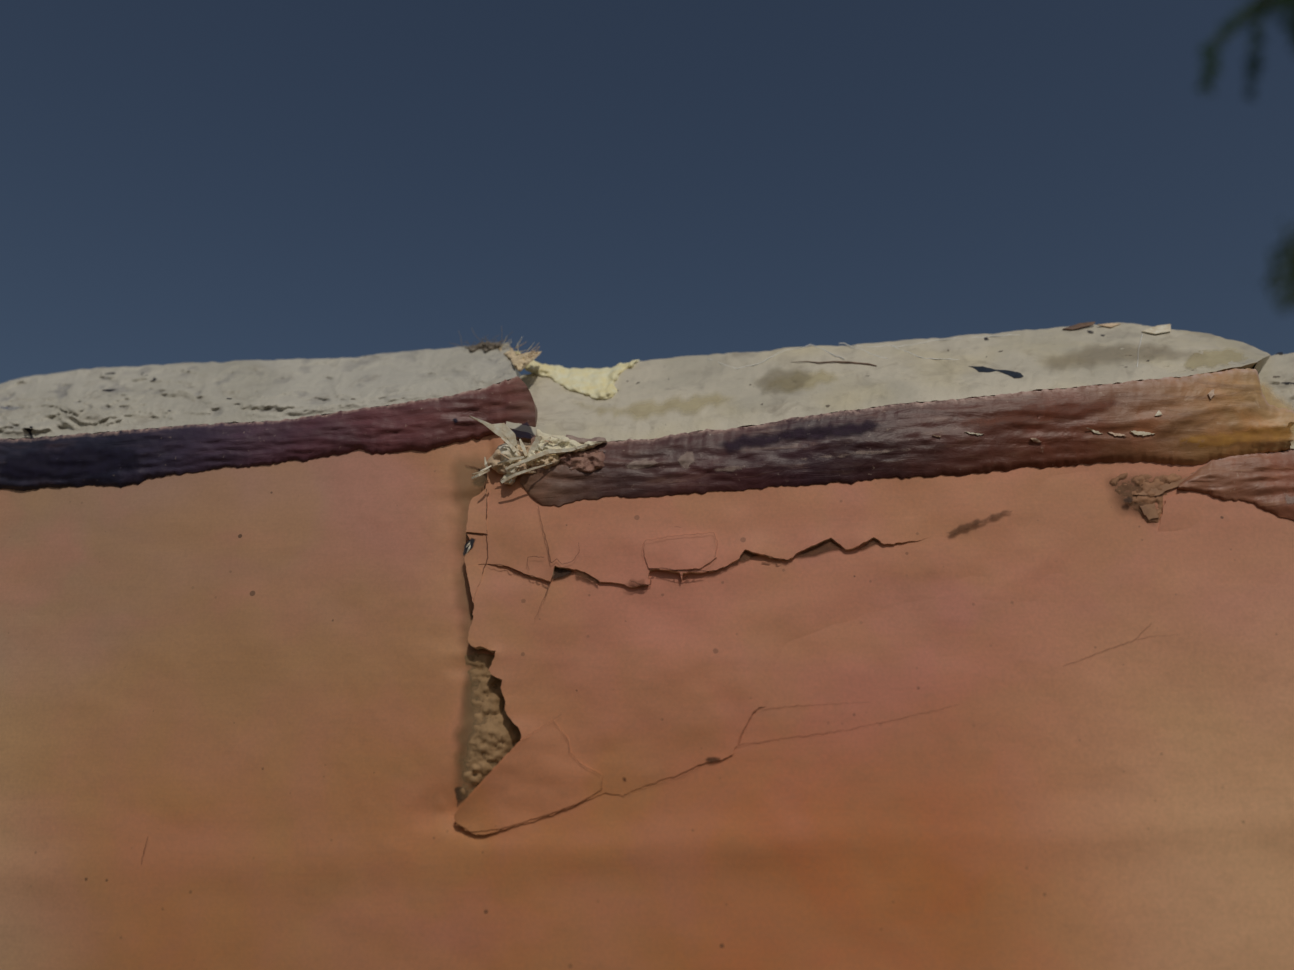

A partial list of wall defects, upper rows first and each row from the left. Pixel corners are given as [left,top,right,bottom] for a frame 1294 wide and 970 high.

peeling [0,368,1294,835]